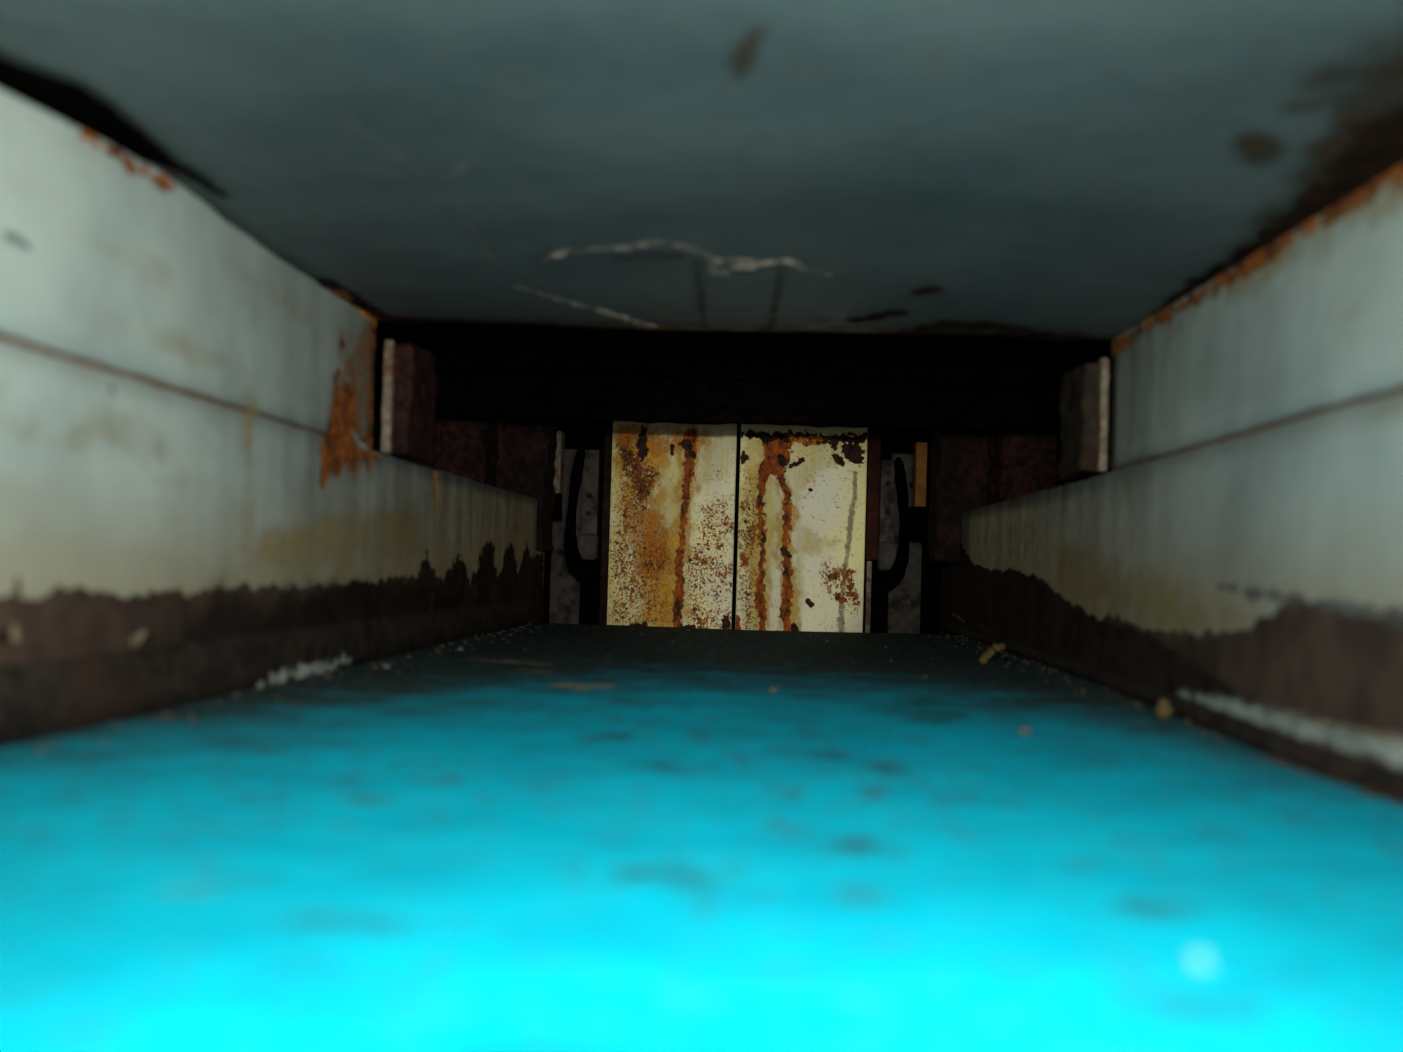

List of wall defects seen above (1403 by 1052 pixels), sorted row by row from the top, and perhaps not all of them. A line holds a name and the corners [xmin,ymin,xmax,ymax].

corrosion [0,53,228,198]
corrosion [317,281,406,489]
crack [514,287,657,327]
crack [553,242,830,322]
corrosion [1112,51,1403,354]
corrosion [608,426,868,631]